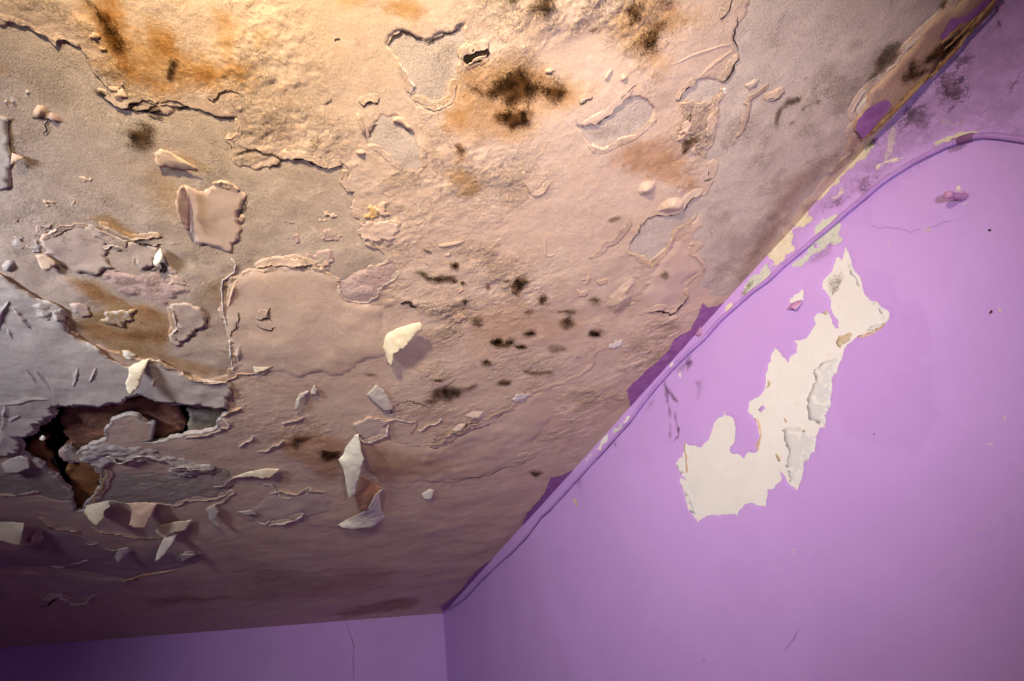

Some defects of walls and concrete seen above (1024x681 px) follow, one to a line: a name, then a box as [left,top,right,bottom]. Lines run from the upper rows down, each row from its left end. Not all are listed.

damp [627,1,669,57]
damp [126,108,161,149]
peeling [387,24,465,111]
damp [472,66,566,130]
peeling [579,86,657,154]
peeling [0,13,428,501]
damp [417,250,464,285]
damp [504,275,529,295]
peeling [629,0,961,522]
damp [490,331,534,349]
peeling [338,340,623,530]
peeling [0,442,334,581]